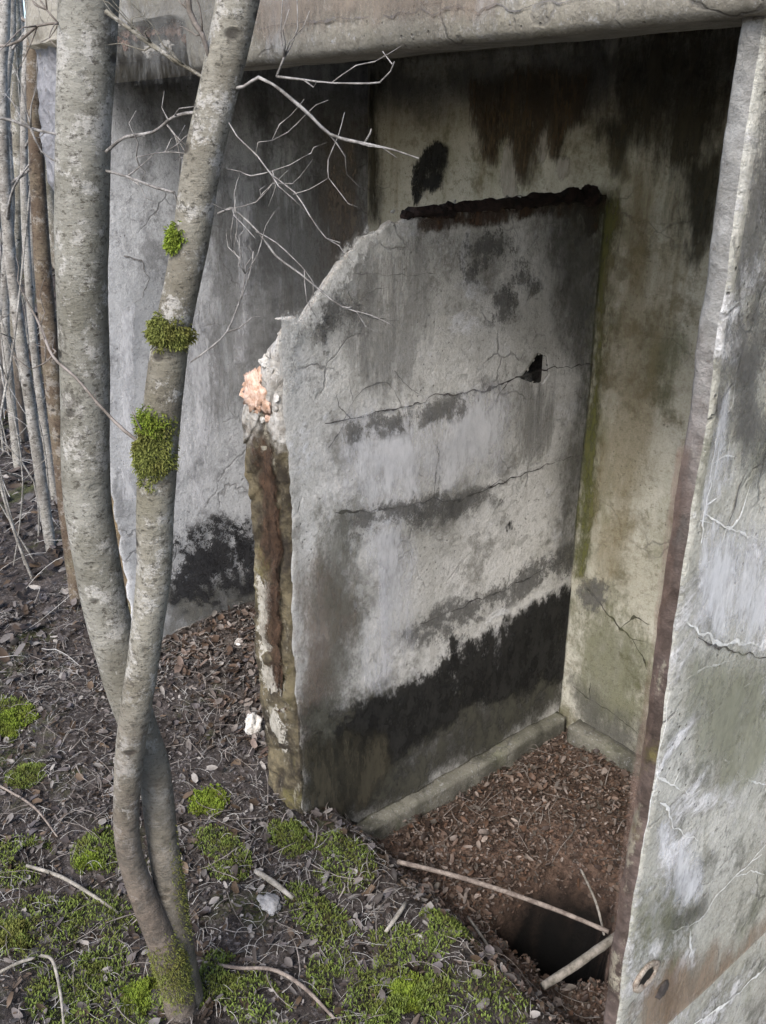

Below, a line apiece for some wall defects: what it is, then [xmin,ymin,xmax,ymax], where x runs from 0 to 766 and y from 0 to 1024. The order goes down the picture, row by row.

water stain [468,65,590,186]
corrosion [418,195,607,234]
water stain [687,158,719,238]
spalling [239,352,279,423]
crack [325,363,589,463]
water stain [401,207,600,646]
spalling [514,344,553,392]
crack [700,369,761,564]
water stain [298,682,400,759]
water stain [345,669,562,822]
crack [642,622,766,850]
crack [694,968,765,1024]